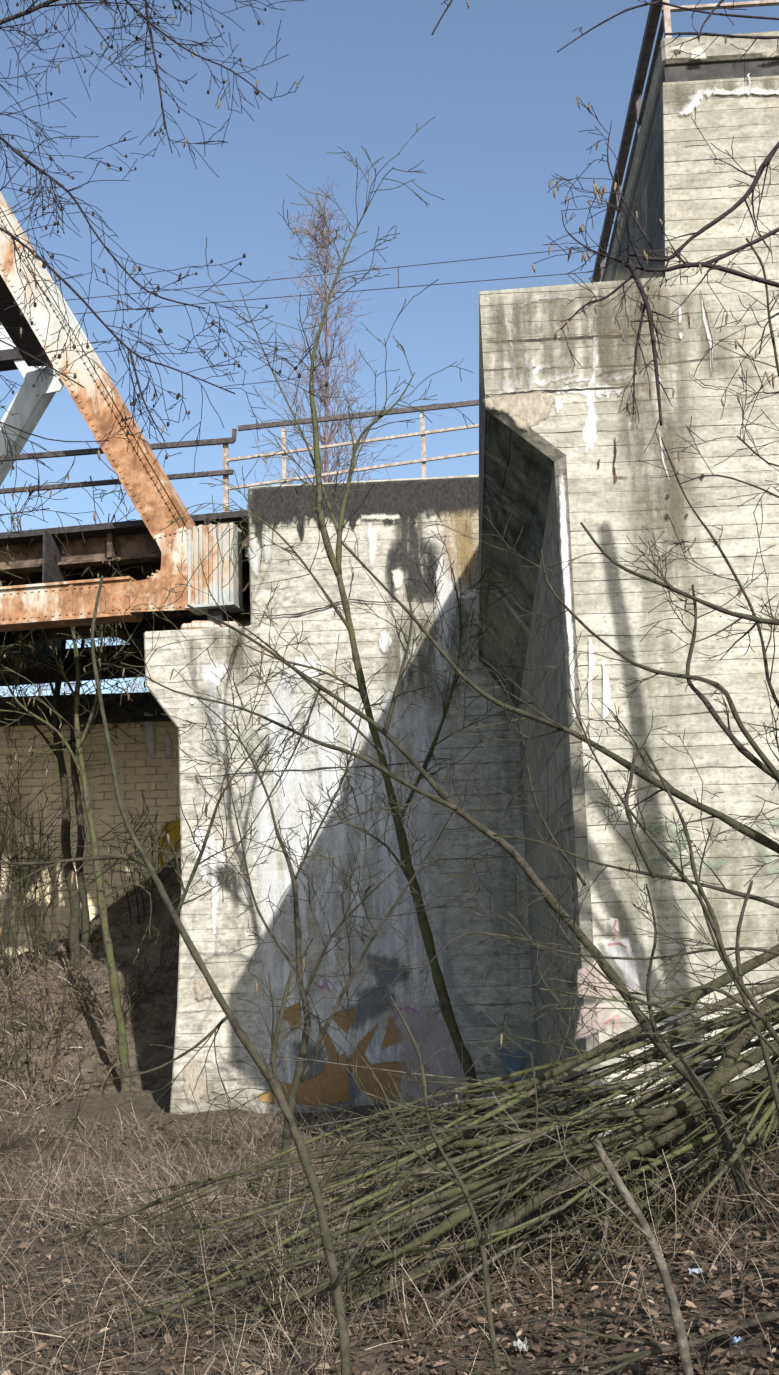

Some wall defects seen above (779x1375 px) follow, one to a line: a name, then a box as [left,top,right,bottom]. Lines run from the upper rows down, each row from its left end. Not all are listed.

water stain [666,73,779,115]
water stain [700,301,735,370]
water stain [494,283,686,572]
efflorescence [249,533,273,576]
efflorescence [559,476,613,720]
water stain [190,632,246,728]
water stain [367,516,472,945]
water stain [190,827,241,937]
water stain [258,656,346,1029]